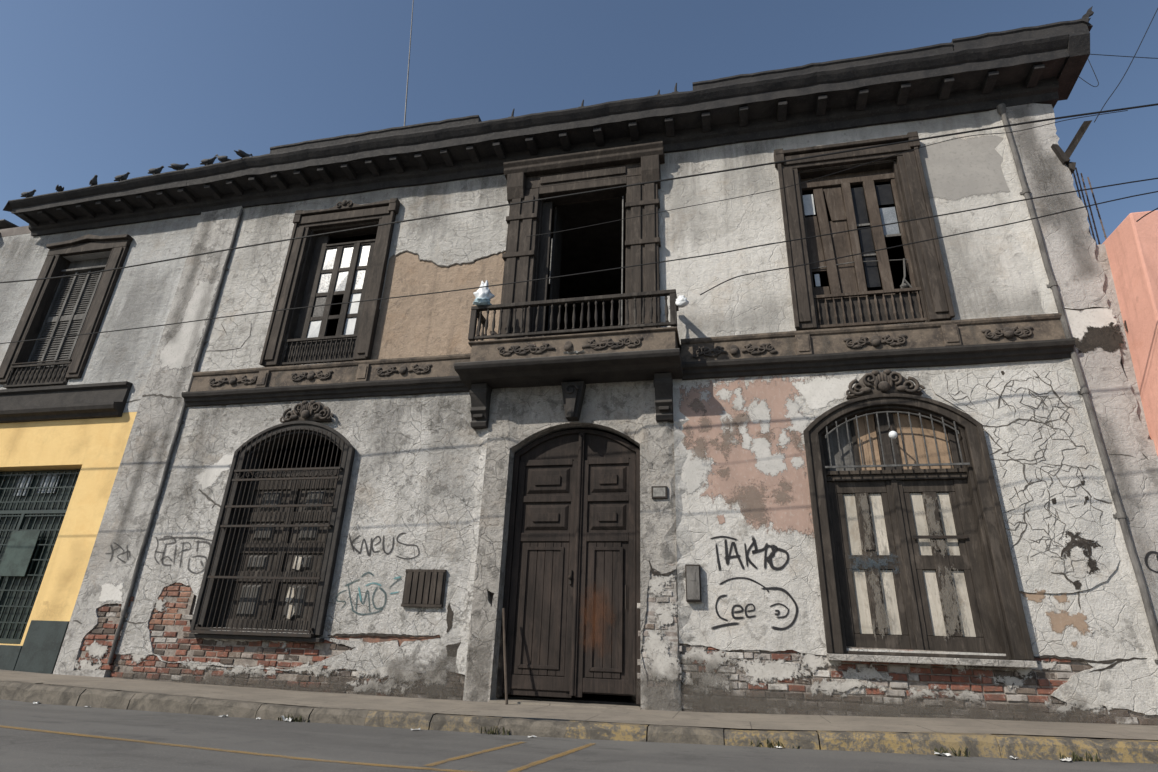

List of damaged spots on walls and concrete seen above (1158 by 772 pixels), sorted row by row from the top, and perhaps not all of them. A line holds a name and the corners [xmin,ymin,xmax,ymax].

peeling [371,250,505,360]
peeling [1063,305,1128,354]
peeling [673,374,858,538]
crack [944,370,1148,610]
flaking render [74,580,465,700]
flaking render [637,531,1158,726]